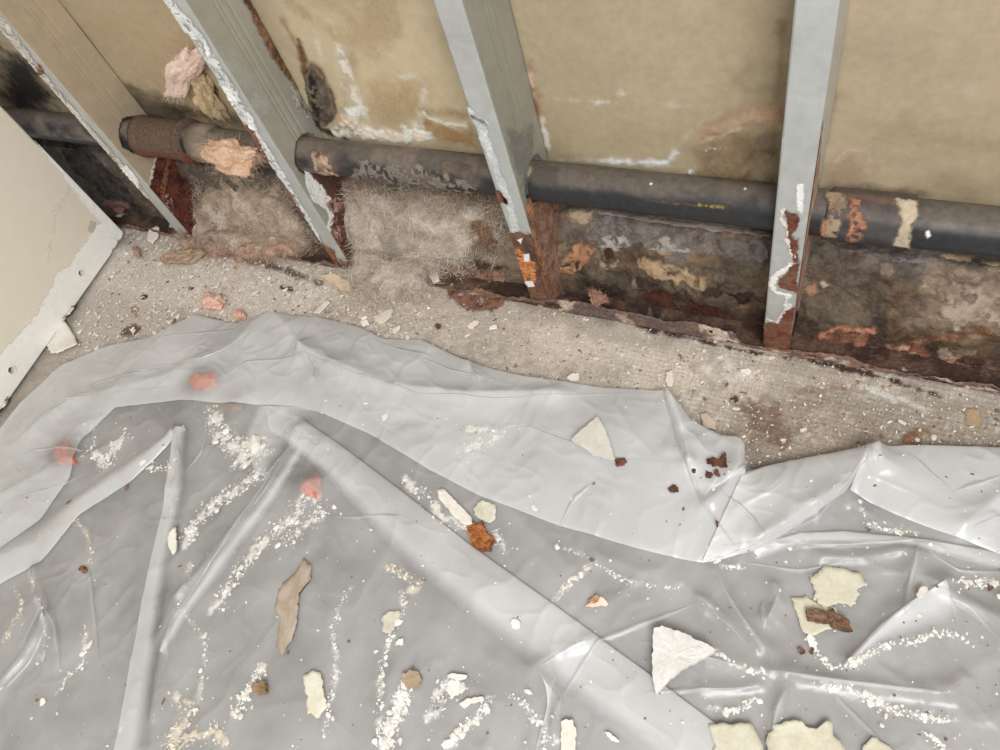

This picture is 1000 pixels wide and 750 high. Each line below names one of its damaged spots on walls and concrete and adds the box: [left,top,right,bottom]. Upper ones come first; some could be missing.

water stain [0,53,51,110]
water stain [125,85,209,120]
water stain [297,39,472,144]
corrosion [148,157,197,238]
spalling [568,208,593,225]
spalling [558,241,752,309]
corrosion [645,289,735,320]
corrosion [760,120,998,370]